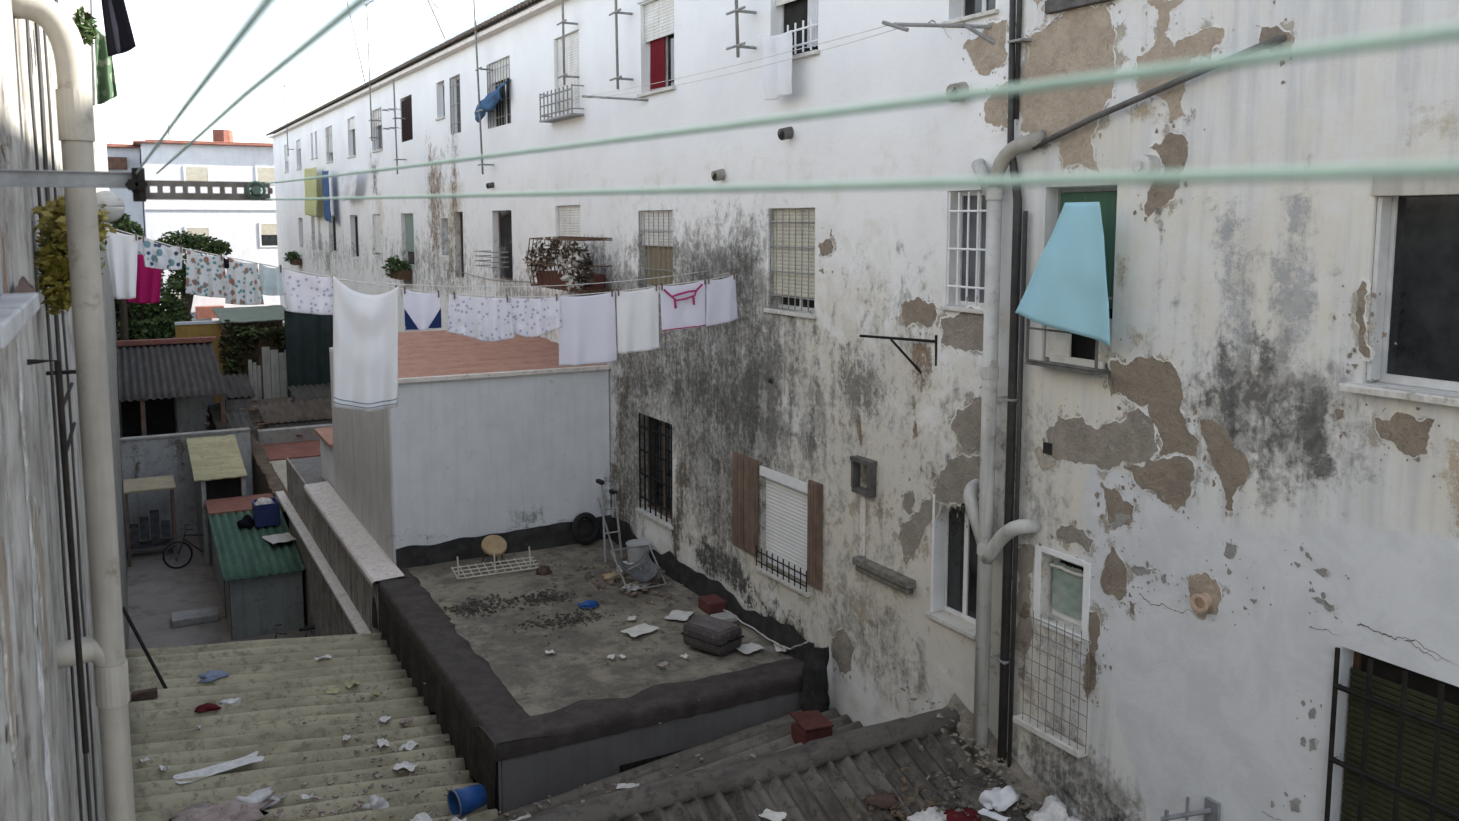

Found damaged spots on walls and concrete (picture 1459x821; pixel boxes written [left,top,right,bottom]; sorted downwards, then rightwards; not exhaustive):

flaking render [961,0,1234,231]
leakage [604,363,658,525]
leakage [670,452,806,638]
leakage [676,317,894,459]
flaking render [886,386,982,569]
flaking render [1011,337,1272,707]
leakage [1218,220,1275,442]
leakage [1270,387,1334,478]
flaking render [1285,543,1349,623]
crack [1310,623,1457,665]
flaking render [1333,403,1441,489]
flaking render [1296,690,1322,769]